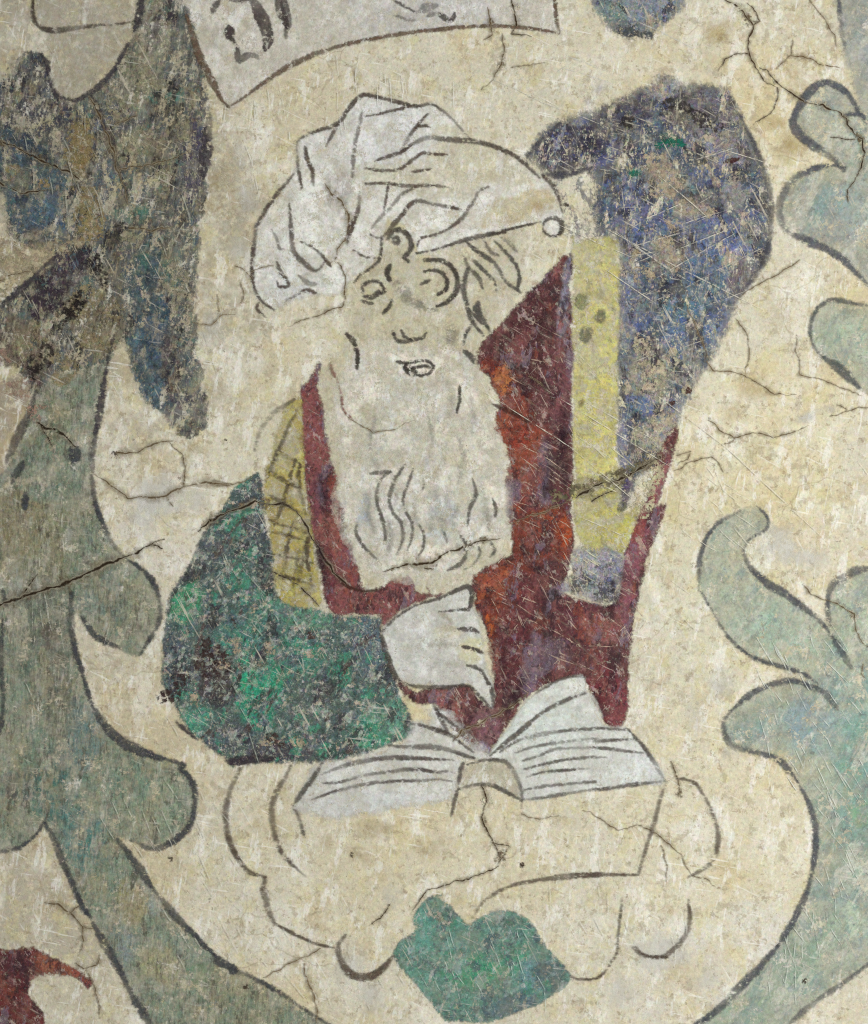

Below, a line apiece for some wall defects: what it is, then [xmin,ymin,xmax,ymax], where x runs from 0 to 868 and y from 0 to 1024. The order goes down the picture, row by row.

crack [718,0,868,201]
crack [687,305,867,416]
crack [94,421,809,592]
crack [0,539,165,606]
crack [274,572,319,606]
crack [369,784,510,926]
crack [583,810,714,886]